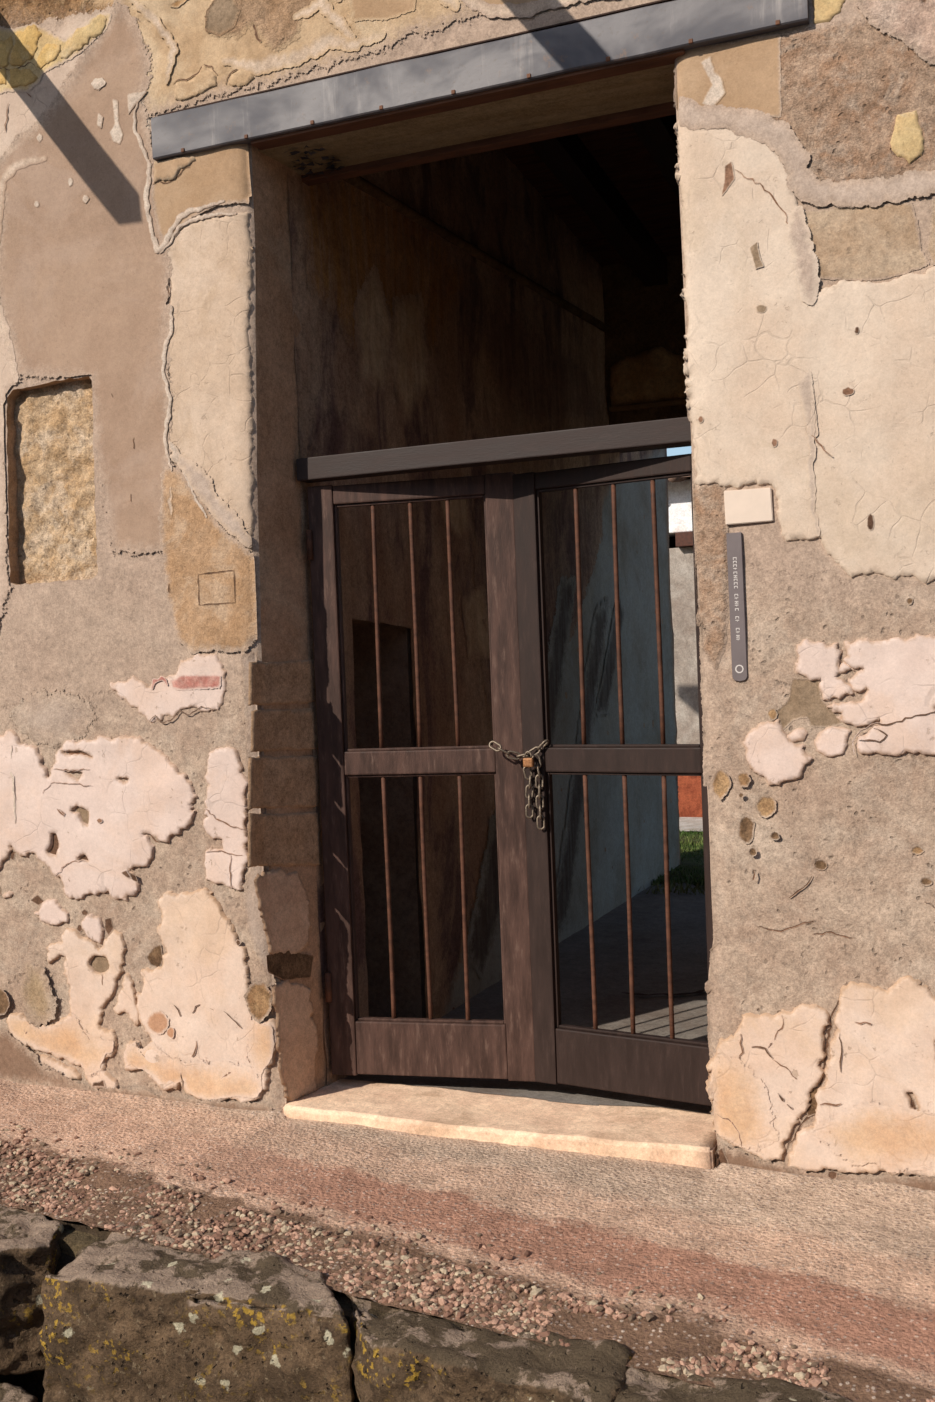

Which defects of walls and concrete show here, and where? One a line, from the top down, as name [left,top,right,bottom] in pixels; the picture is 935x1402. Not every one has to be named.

peeling [633,449,666,460]
peeling [0,0,590,1108]
peeling [553,479,677,744]
peeling [673,0,935,1178]
peeling [552,774,681,943]
crack [716,1113,742,1147]
crack [736,982,872,1154]
crack [908,1093,918,1111]